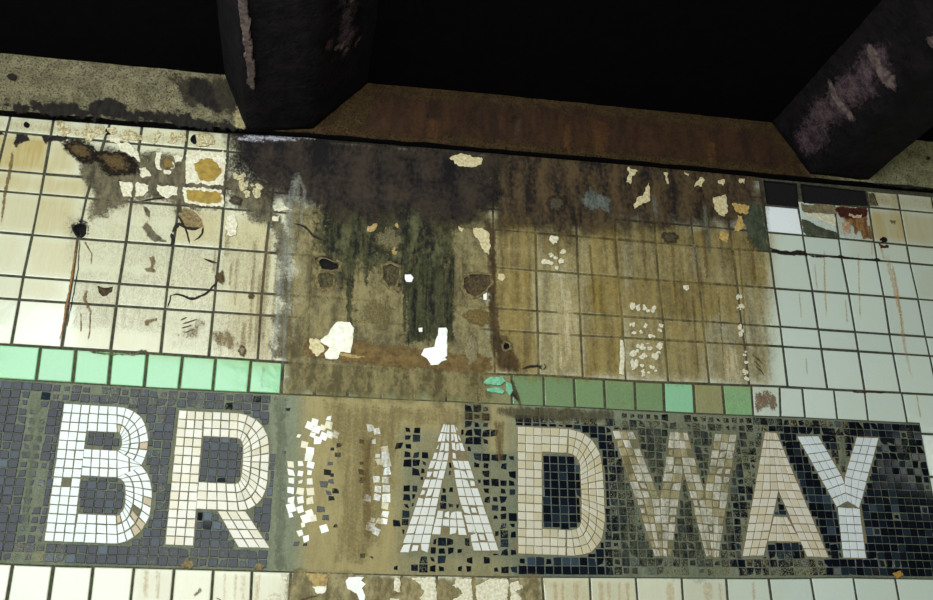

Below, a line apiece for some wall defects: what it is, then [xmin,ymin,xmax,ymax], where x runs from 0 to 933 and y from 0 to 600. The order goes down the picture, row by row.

peeling [57,123,142,143]
damp [4,77,315,143]
peeling [119,167,151,197]
peeling [153,130,264,228]
damp [582,186,610,212]
rust [835,206,889,249]
rust [60,240,80,338]
crack [167,216,218,308]
damp [285,199,766,405]
peeling [309,338,325,356]
peeling [629,302,663,377]